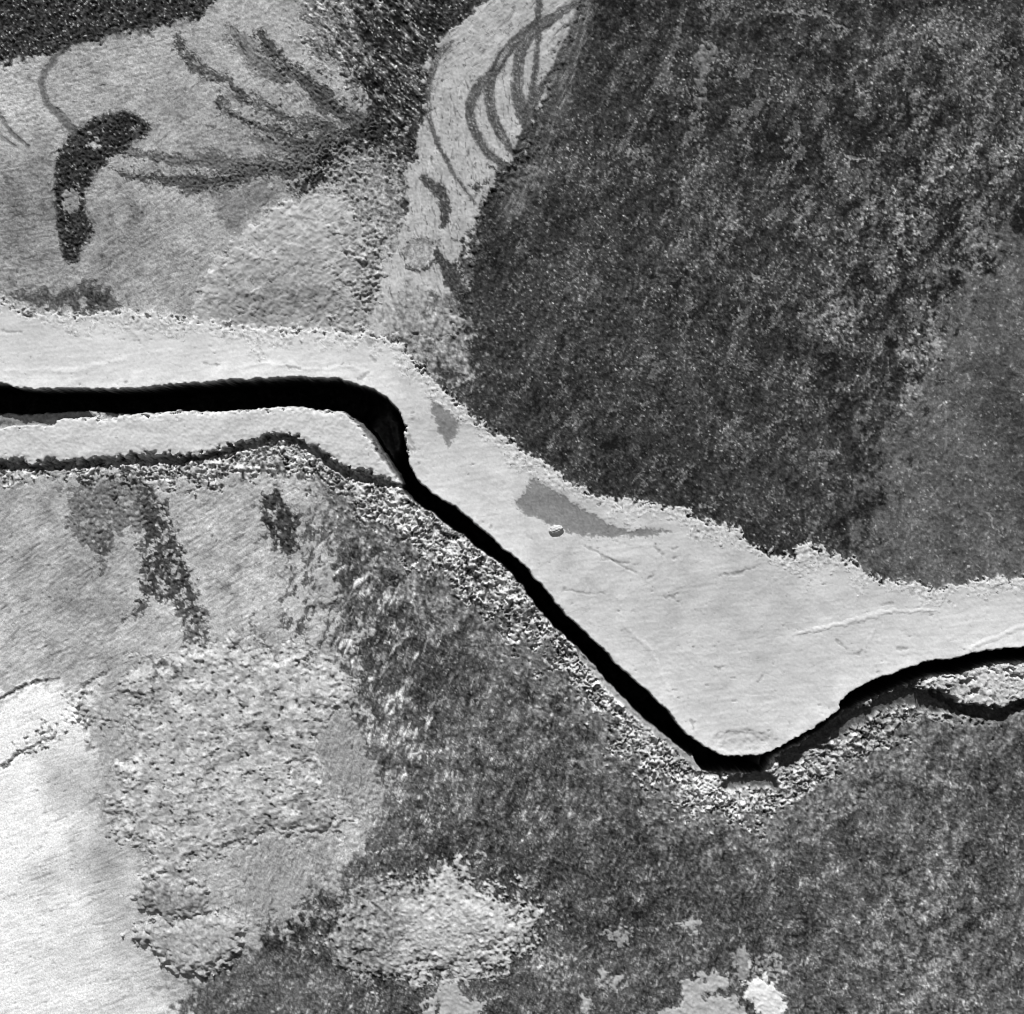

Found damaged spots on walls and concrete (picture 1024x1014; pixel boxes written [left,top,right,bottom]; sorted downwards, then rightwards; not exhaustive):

crack [0,376,1024,773]